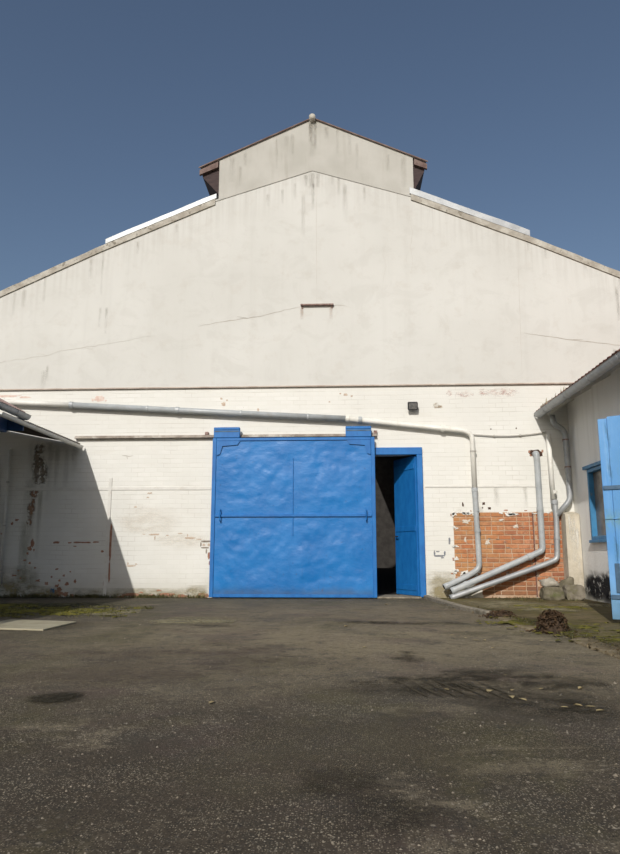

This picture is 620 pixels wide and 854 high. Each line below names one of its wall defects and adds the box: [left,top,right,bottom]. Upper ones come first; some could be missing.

crack [527,333,620,346]
peeling [53,524,112,582]
spalling [143,533,210,565]
flaking render [450,502,566,598]